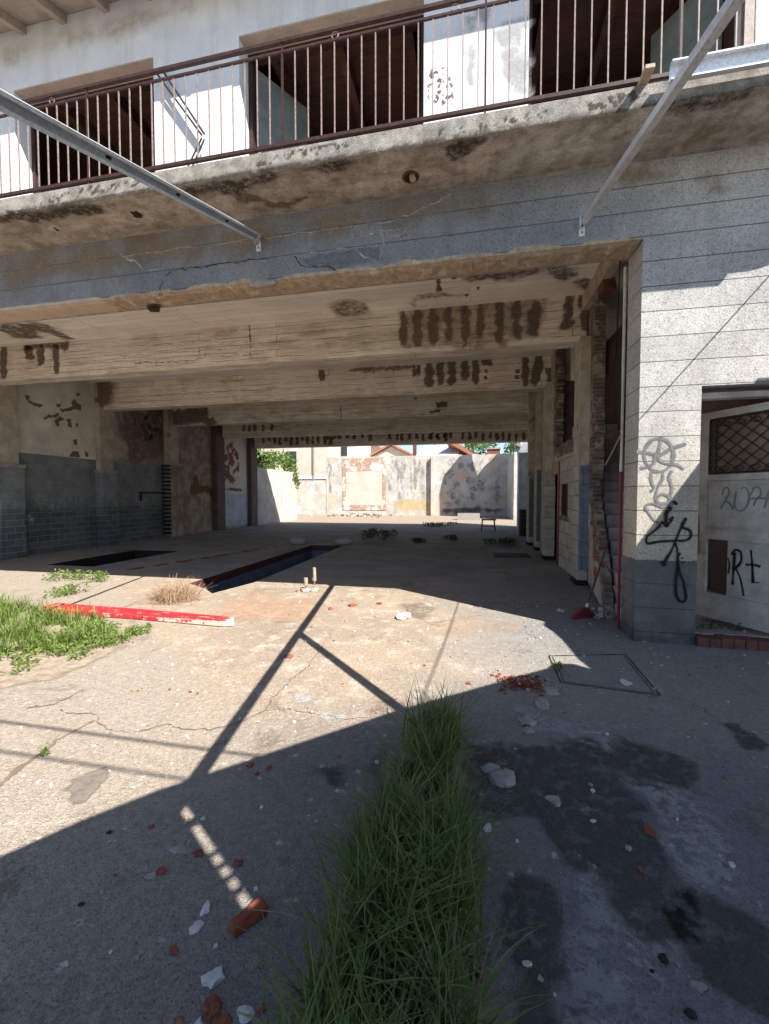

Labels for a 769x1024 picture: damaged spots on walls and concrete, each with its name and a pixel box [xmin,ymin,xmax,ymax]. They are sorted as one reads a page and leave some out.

peeling [428,67,453,105]
leakage [172,88,753,208]
crack [70,194,451,364]
leakage [333,302,368,317]
leakage [350,266,589,387]
peeling [25,393,88,457]
peeling [225,443,242,492]
crack [0,629,365,786]